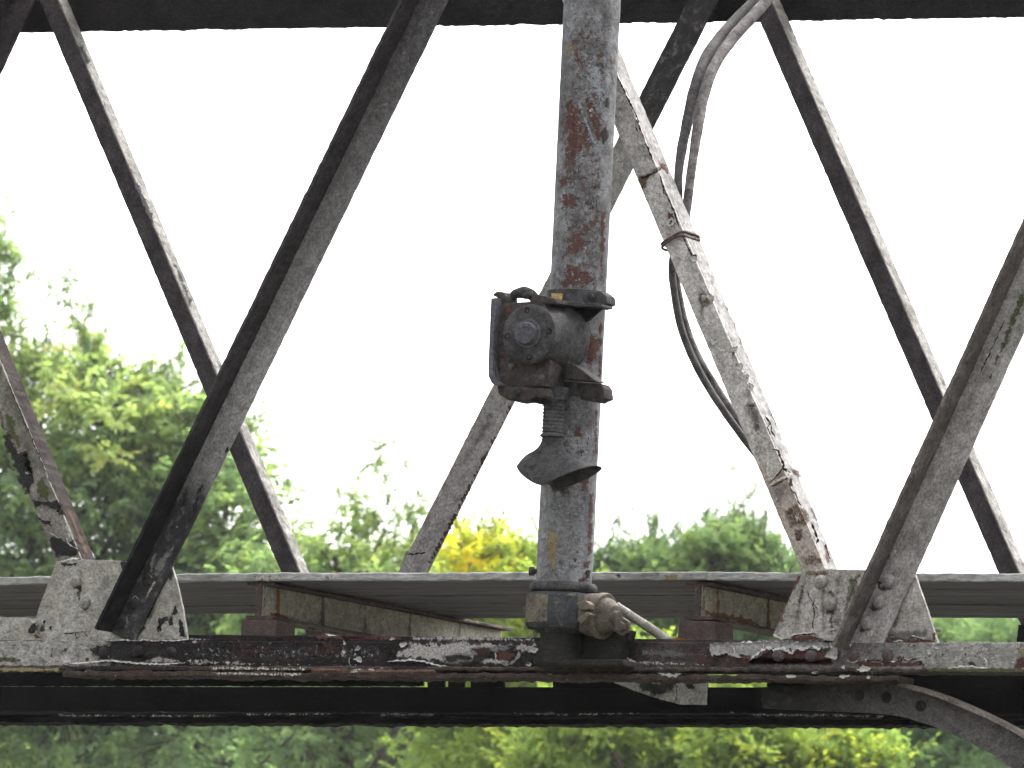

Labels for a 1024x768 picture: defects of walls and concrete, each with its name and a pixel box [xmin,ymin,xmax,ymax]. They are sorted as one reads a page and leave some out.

corrosion [557,18,610,289]
corrosion [567,410,598,456]
crack [765,413,791,482]
corrosion [546,485,594,582]
peeling [54,635,538,676]
peeling [627,628,939,679]
peeling [948,647,989,669]